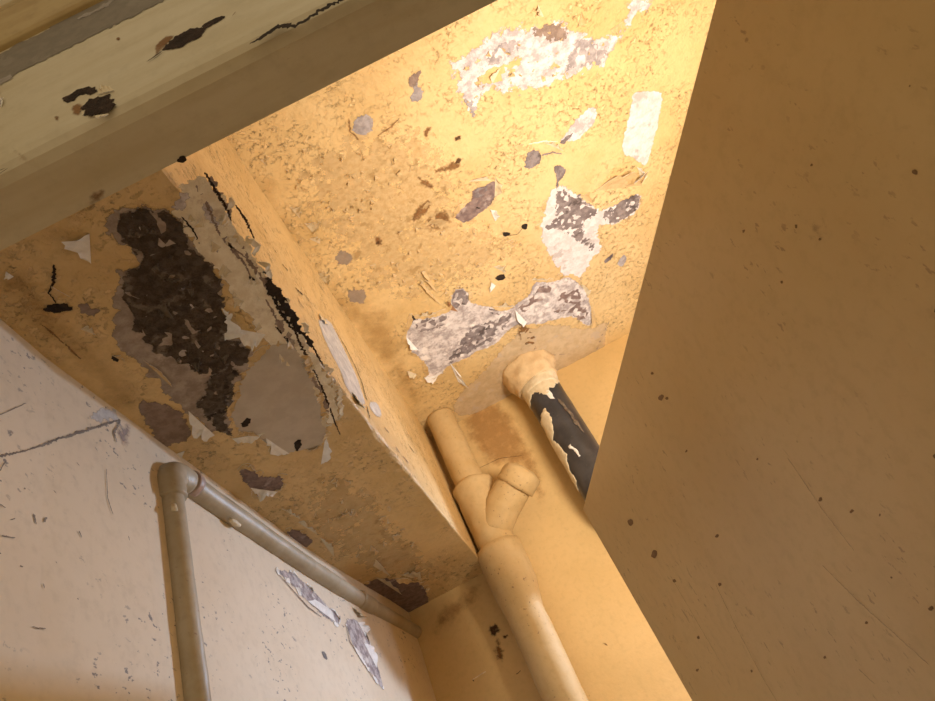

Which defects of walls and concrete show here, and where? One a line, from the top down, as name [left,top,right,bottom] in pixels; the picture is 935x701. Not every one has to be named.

peeling [0,0,163,84]
crack [250,0,343,44]
peeling [449,0,653,117]
peeling [512,107,597,169]
peeling [622,91,663,180]
peeling [43,265,100,316]
spalling [62,234,91,263]
spalling [104,172,382,464]
crack [263,271,340,434]
spalling [402,165,644,387]
peeling [275,567,384,690]
spalling [364,560,431,613]